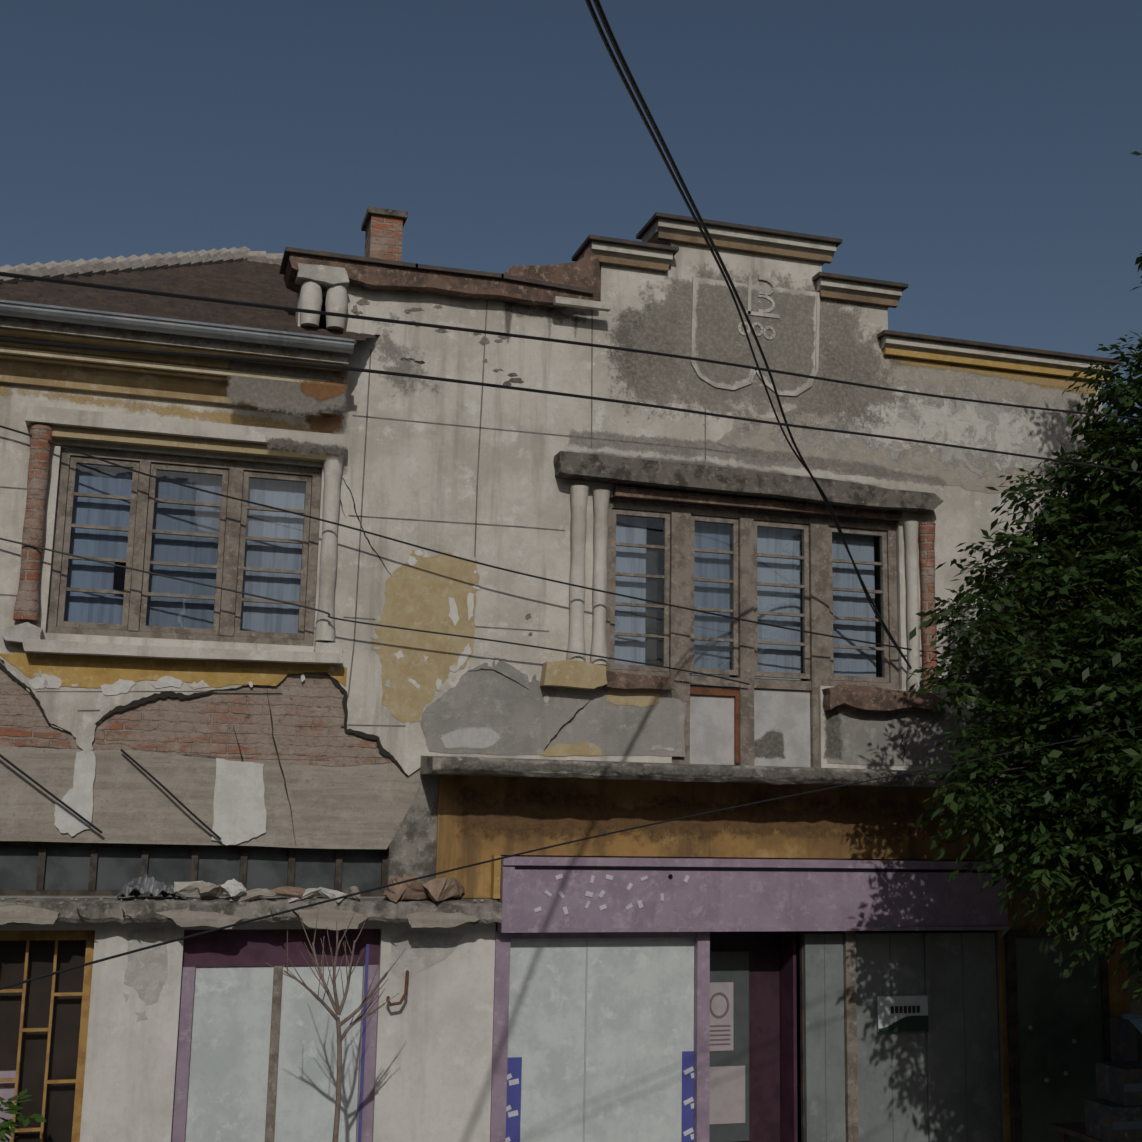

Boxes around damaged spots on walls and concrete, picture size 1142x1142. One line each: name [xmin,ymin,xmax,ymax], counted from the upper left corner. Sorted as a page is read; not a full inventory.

water stain [610,265,908,431]
water stain [569,429,945,487]
crack [340,477,391,575]
peeling [371,549,481,723]
crack [472,668,528,689]
crack [544,699,591,751]
peeling [541,742,602,756]
peeling [606,688,661,707]
flaking render [0,652,479,980]
water stain [460,791,1000,846]